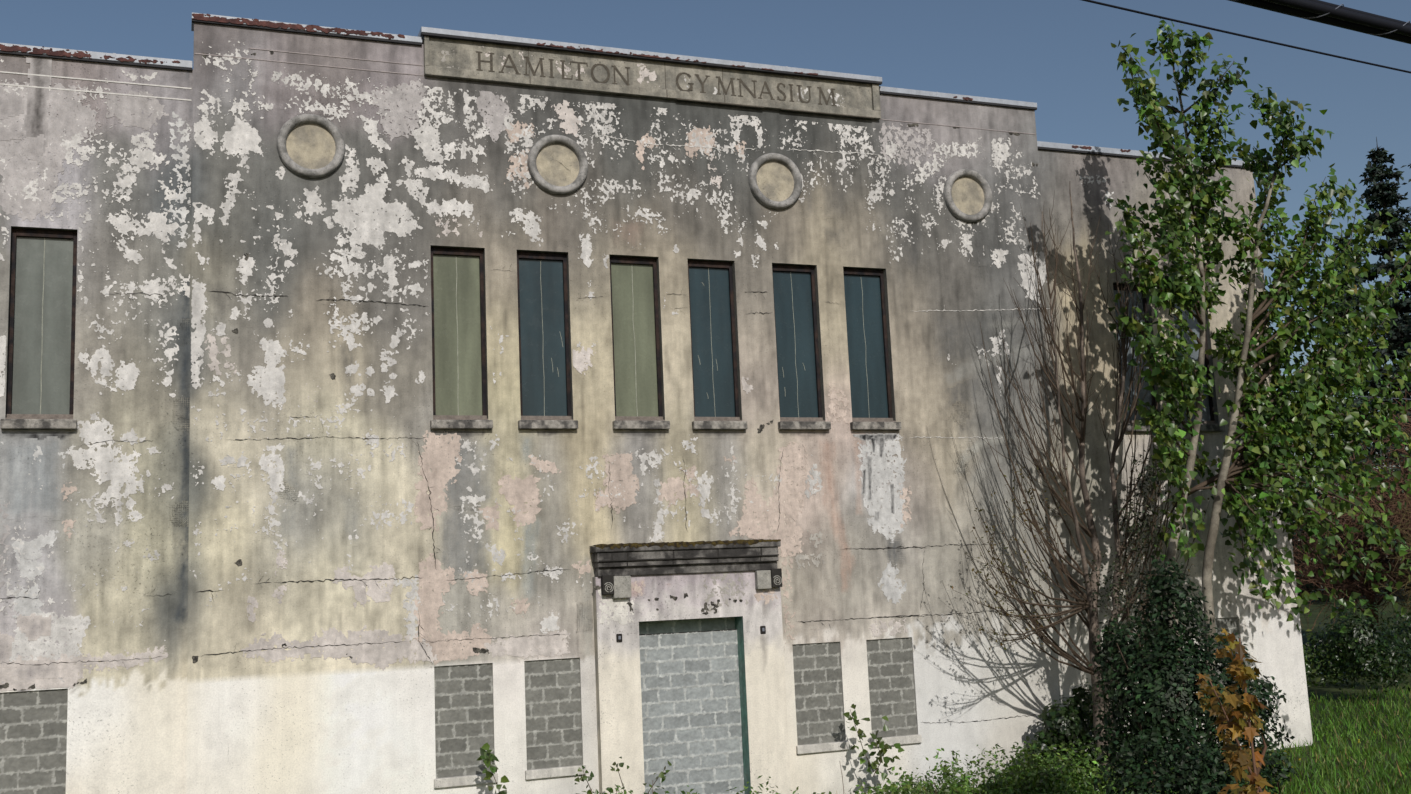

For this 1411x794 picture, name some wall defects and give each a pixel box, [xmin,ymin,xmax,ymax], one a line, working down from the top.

water stain [168,269,248,629]
water stain [332,338,359,409]
crack [204,416,567,666]
peeling [0,38,1047,691]